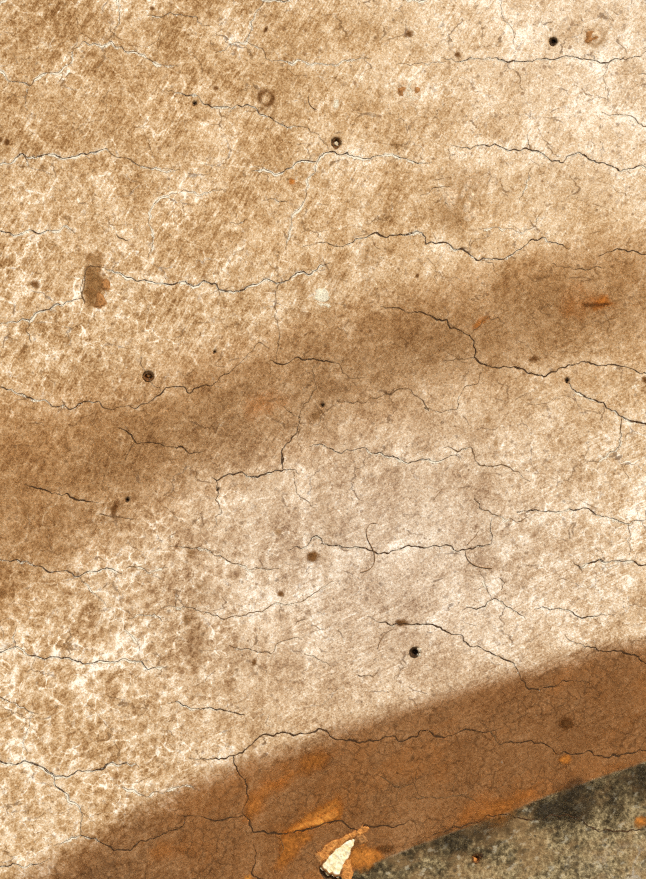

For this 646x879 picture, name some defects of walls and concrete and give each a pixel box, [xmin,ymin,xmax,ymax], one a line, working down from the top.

crack [399,0,646,82]
crack [0,90,646,522]
crack [290,500,646,570]
crack [0,582,330,670]
crack [373,618,589,690]
crack [465,574,610,620]
leakage [166,778,248,879]
corrosion [280,799,341,862]
crack [0,696,646,879]
spalling [314,824,370,879]
corrosion [351,850,379,866]
leakage [277,652,646,879]